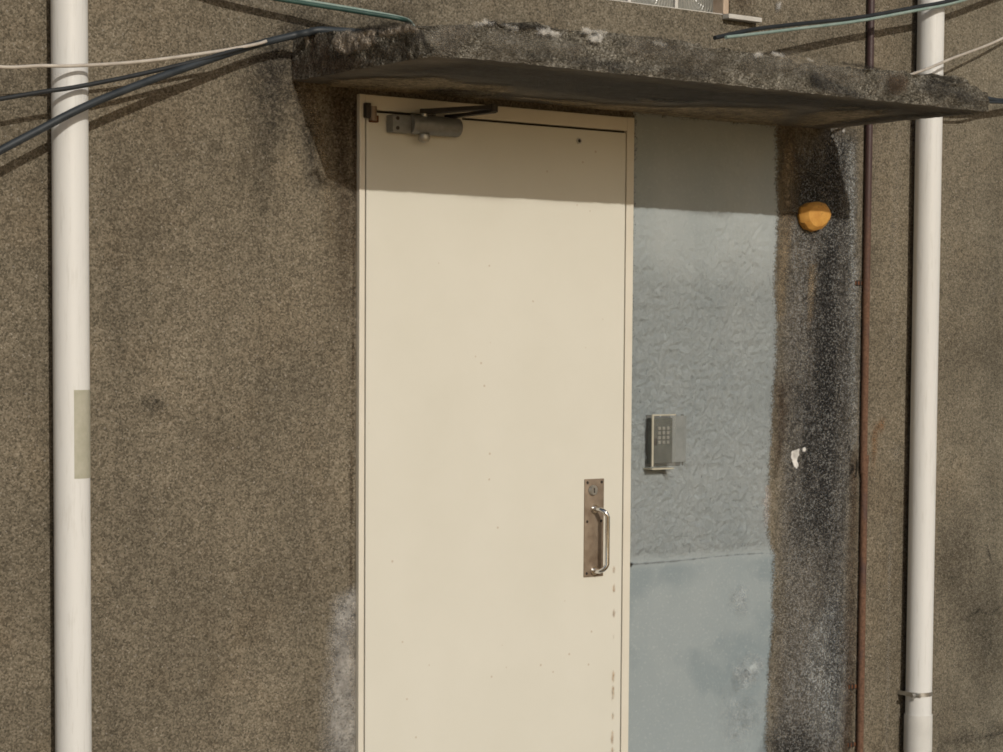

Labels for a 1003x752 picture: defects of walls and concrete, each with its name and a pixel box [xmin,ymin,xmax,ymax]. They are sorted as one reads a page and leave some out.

leakage [322,67,954,181]
leakage [778,137,856,752]
leakage [330,594,356,752]